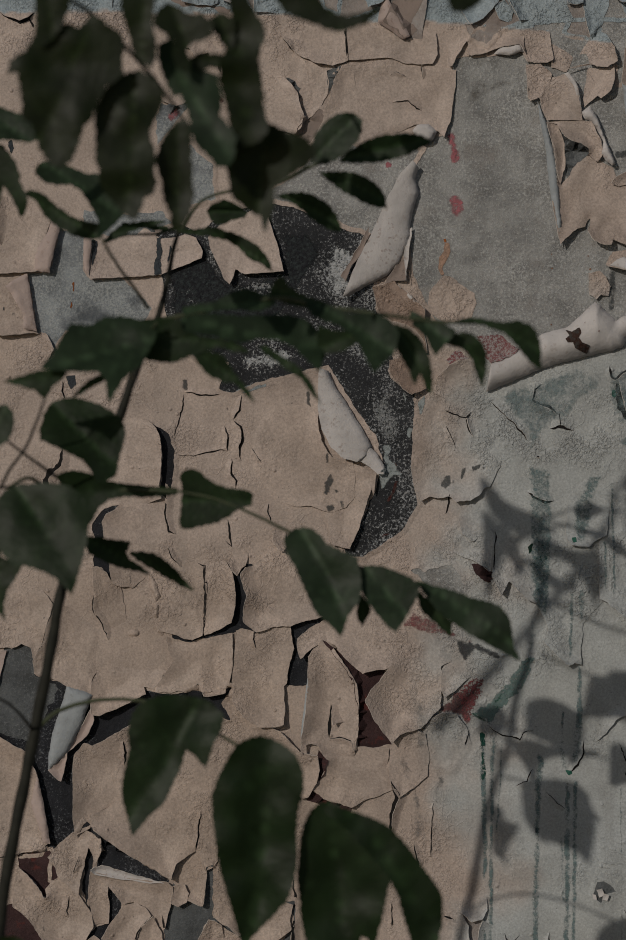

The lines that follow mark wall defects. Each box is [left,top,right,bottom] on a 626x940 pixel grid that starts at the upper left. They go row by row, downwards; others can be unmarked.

peeling [0,0,626,666]
crack [174,380,261,489]
crack [263,504,271,521]
peeling [0,418,499,940]
water stain [480,732,502,938]
water stain [533,755,544,940]
water stain [561,747,578,940]